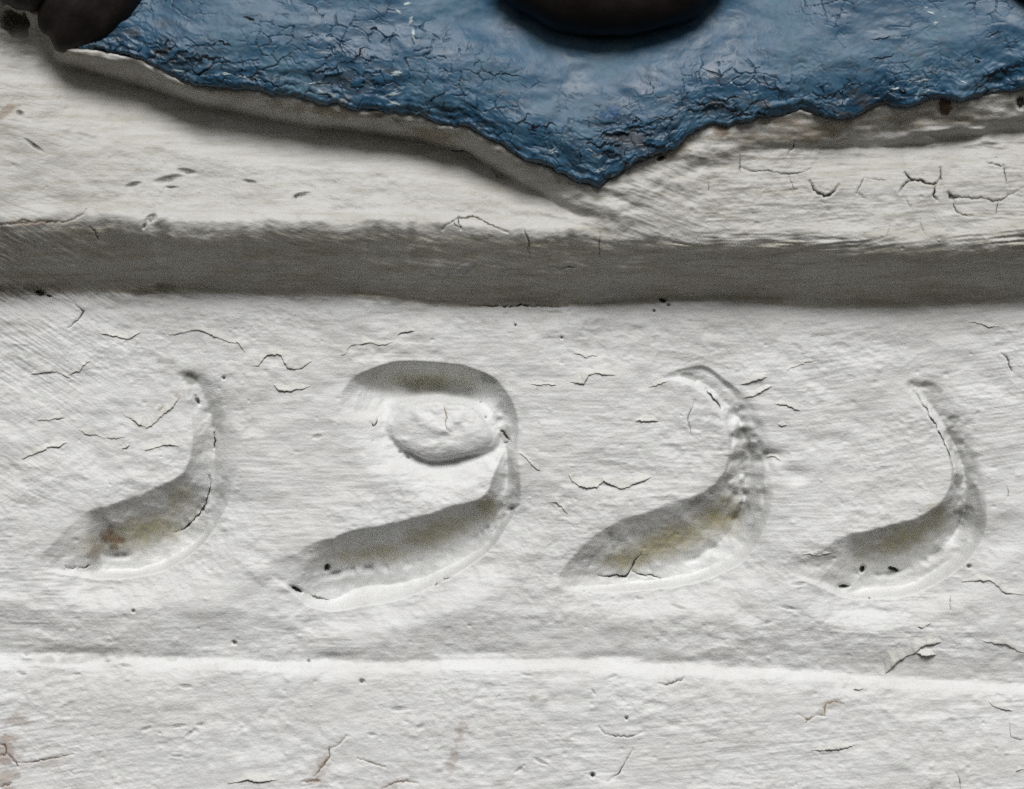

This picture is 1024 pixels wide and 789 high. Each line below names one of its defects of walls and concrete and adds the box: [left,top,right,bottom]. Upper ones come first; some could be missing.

crack [165,39,231,62]
crack [307,27,378,73]
crack [975,60,1020,81]
crack [717,76,784,119]
crack [812,83,906,100]
crack [512,113,557,131]
crack [586,110,682,159]
crack [739,142,1015,231]
crack [448,215,530,246]